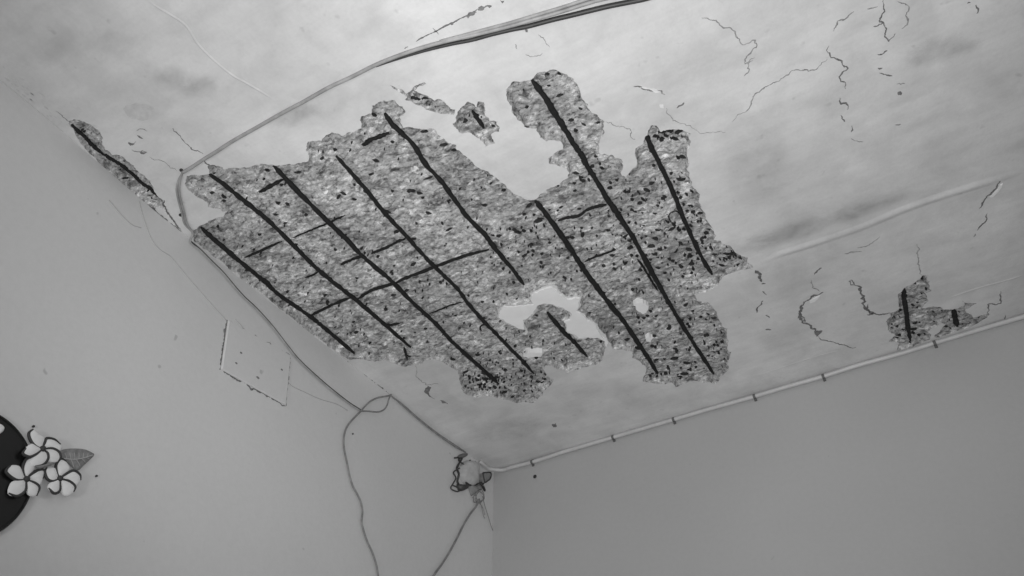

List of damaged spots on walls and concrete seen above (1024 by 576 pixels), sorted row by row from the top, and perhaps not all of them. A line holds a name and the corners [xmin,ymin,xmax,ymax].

crack [634,1,910,142]
spalling [69,119,168,215]
spalling [185,69,753,403]
crack [974,181,1003,237]
crack [798,268,856,348]
crack [849,280,889,316]
spalling [886,275,990,350]